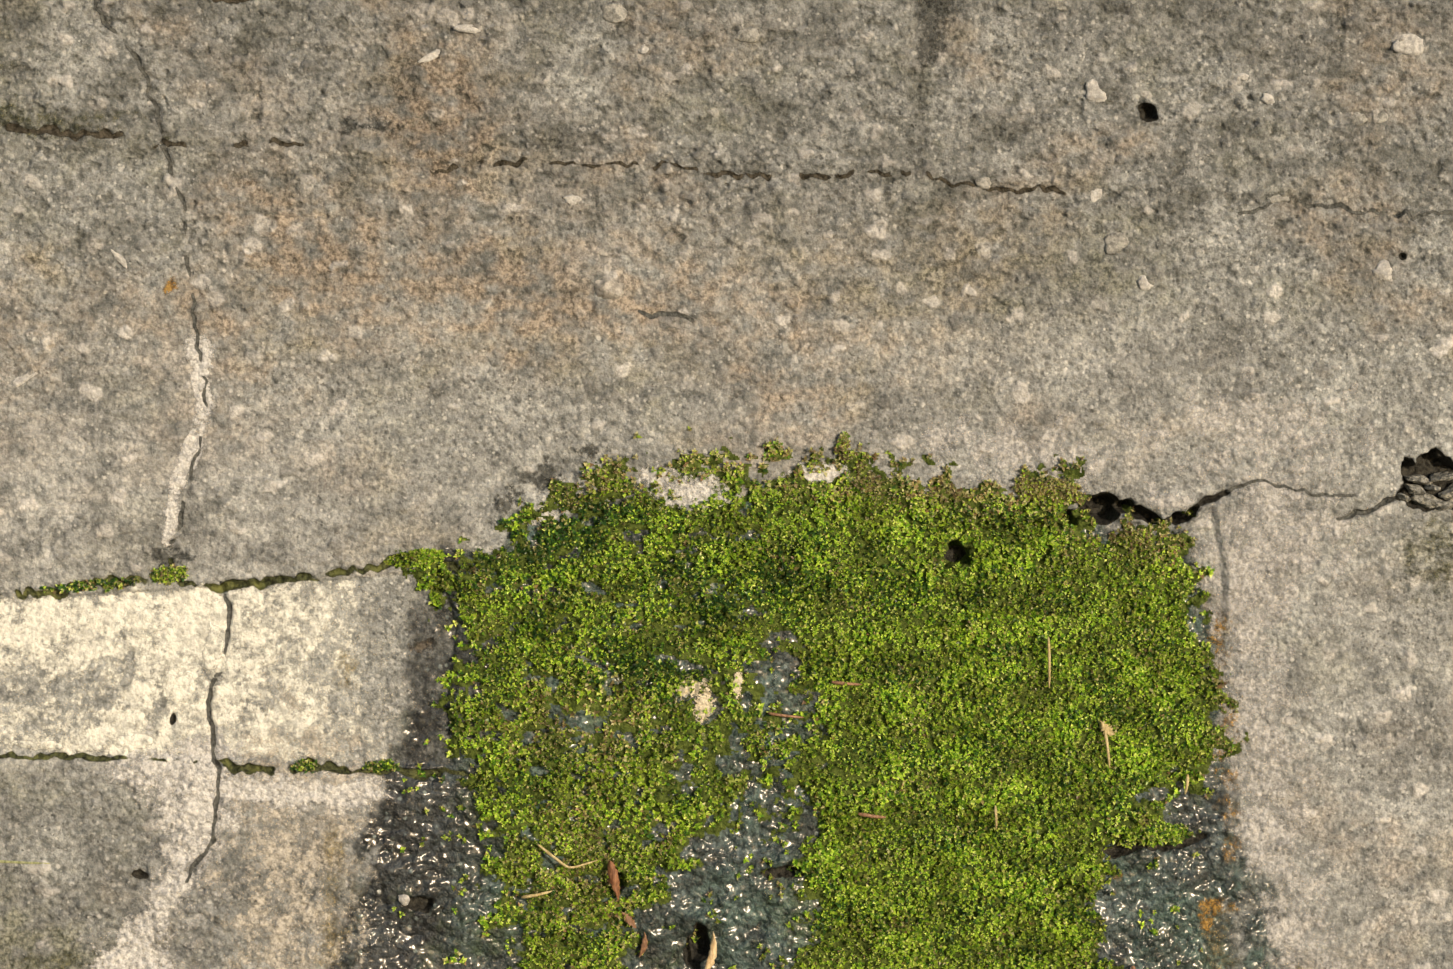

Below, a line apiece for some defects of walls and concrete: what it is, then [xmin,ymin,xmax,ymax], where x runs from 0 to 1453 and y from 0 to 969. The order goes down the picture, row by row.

crack [0,0,503,883]
damp [761,462,850,488]
damp [904,416,1117,487]
crack [1063,479,1397,525]
spalling [1394,447,1453,512]
damp [78,443,829,969]
damp [1081,378,1371,969]